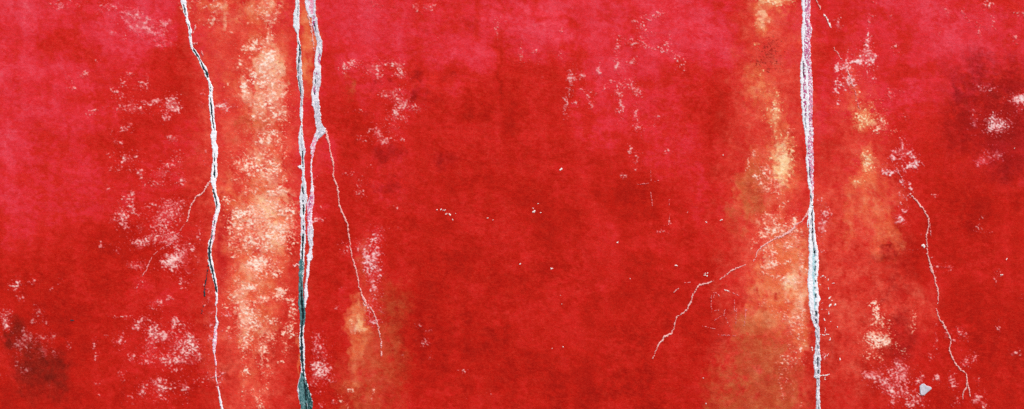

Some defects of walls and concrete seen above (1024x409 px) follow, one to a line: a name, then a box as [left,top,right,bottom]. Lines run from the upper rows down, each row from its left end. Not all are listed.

crack [136,0,226,409]
corrosion [170,0,333,409]
crack [293,0,382,409]
crack [652,0,859,409]
corrosion [697,0,946,409]
peeling [851,297,990,409]
crack [890,156,971,398]